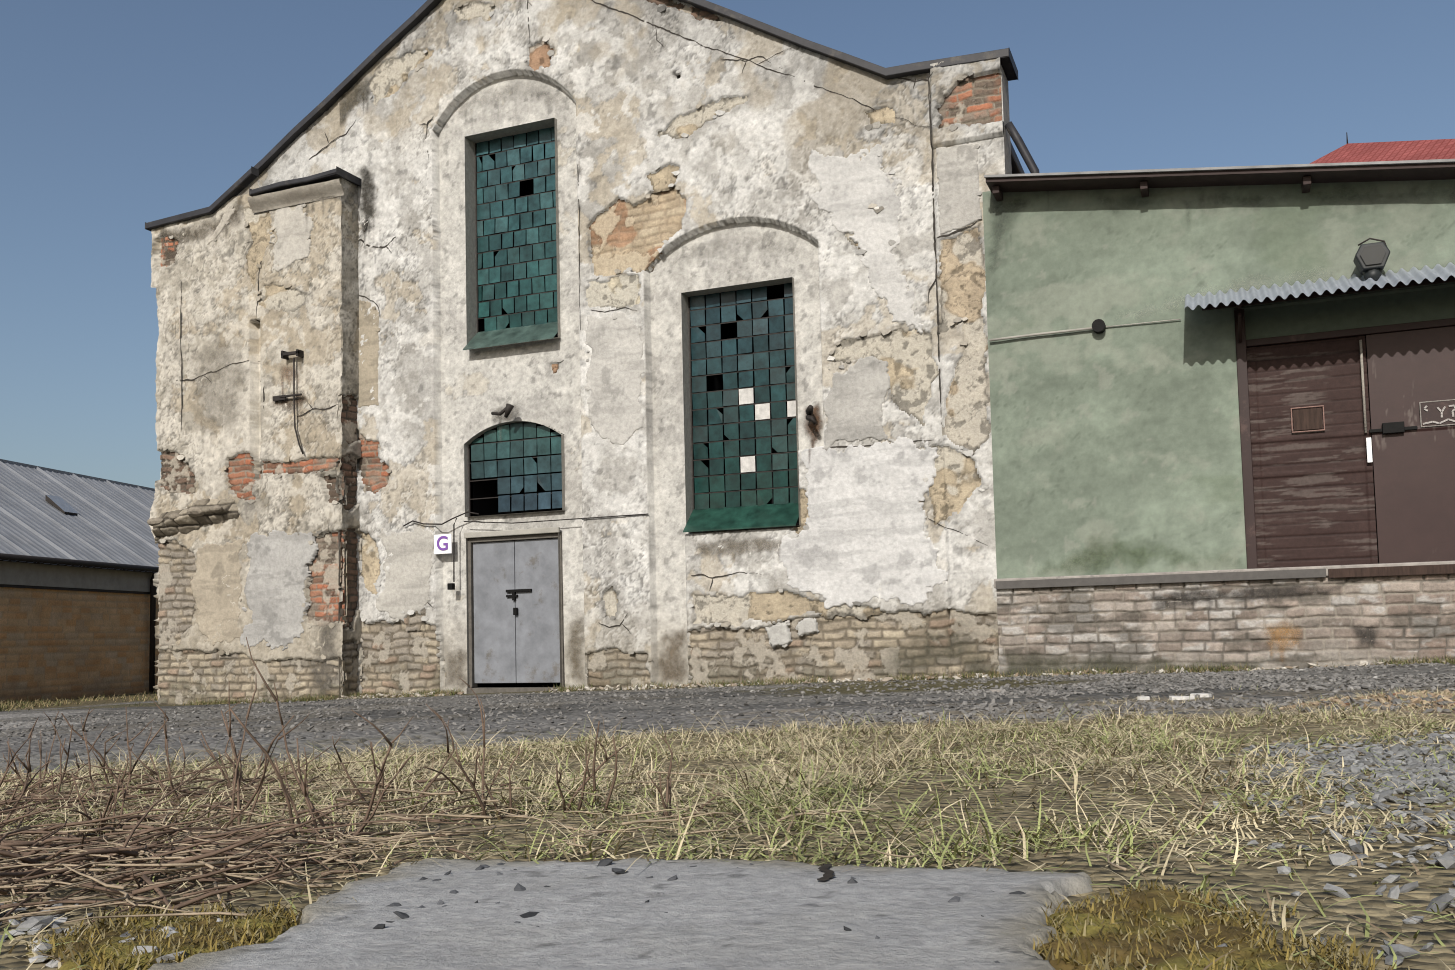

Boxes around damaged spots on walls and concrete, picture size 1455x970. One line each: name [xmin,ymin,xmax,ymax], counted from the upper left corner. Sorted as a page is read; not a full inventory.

spalling [524,36,554,71]
flaking render [937,72,1002,132]
flaking render [161,235,179,267]
crack [577,166,637,330]
flaking render [589,164,686,277]
crack [592,0,983,448]
spalling [827,227,991,525]
flaking render [158,394,446,705]
flaking render [587,648,653,689]
flaking render [687,589,999,685]